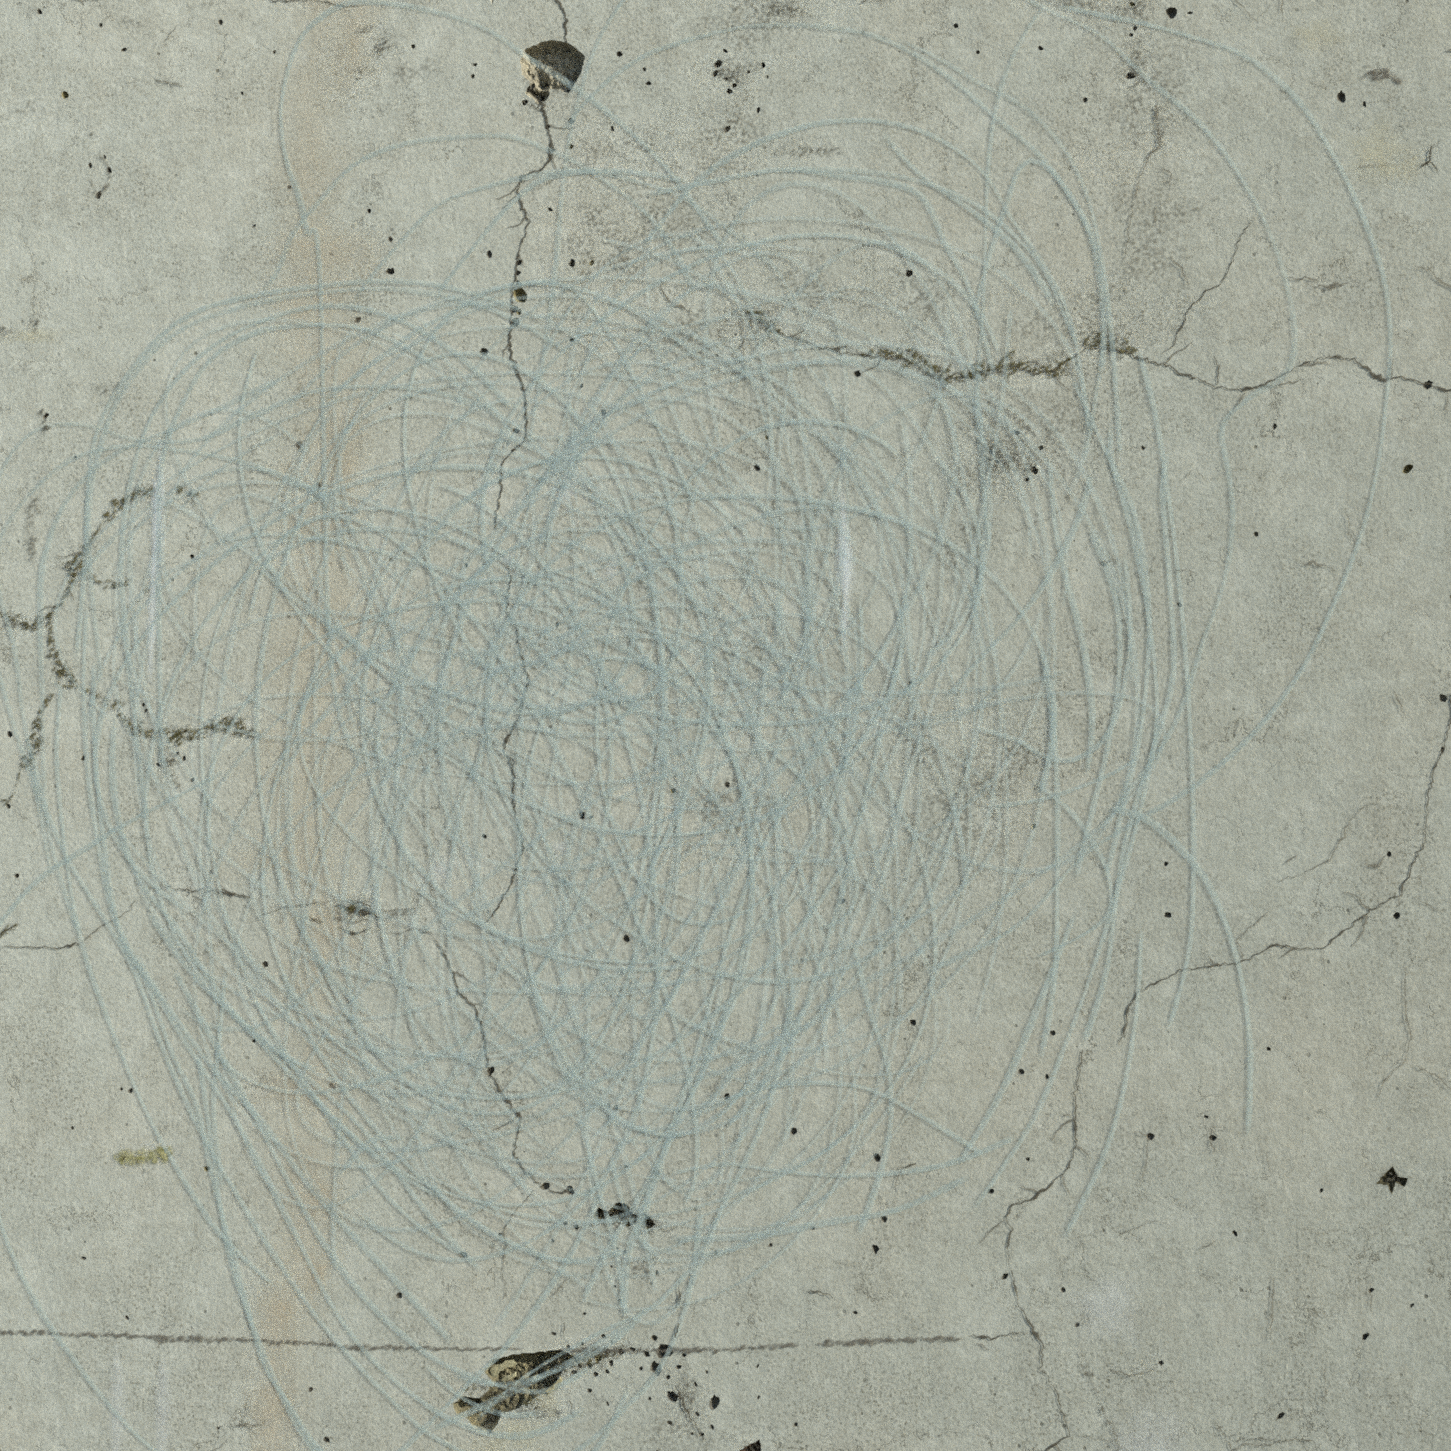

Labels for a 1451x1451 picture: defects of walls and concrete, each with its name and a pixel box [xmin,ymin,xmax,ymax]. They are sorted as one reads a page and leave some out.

crack [495,102,575,530]
spalling [520,40,585,107]
crack [736,217,1451,424]
crack [1125,104,1171,255]
crack [0,485,257,805]
crack [485,564,531,923]
crack [1119,694,1451,1042]
crack [0,1329,522,1351]
crack [0,882,573,1299]
spalling [453,1332,687,1435]
spalling [690,1394,720,1437]
crack [554,1023,1158,1451]